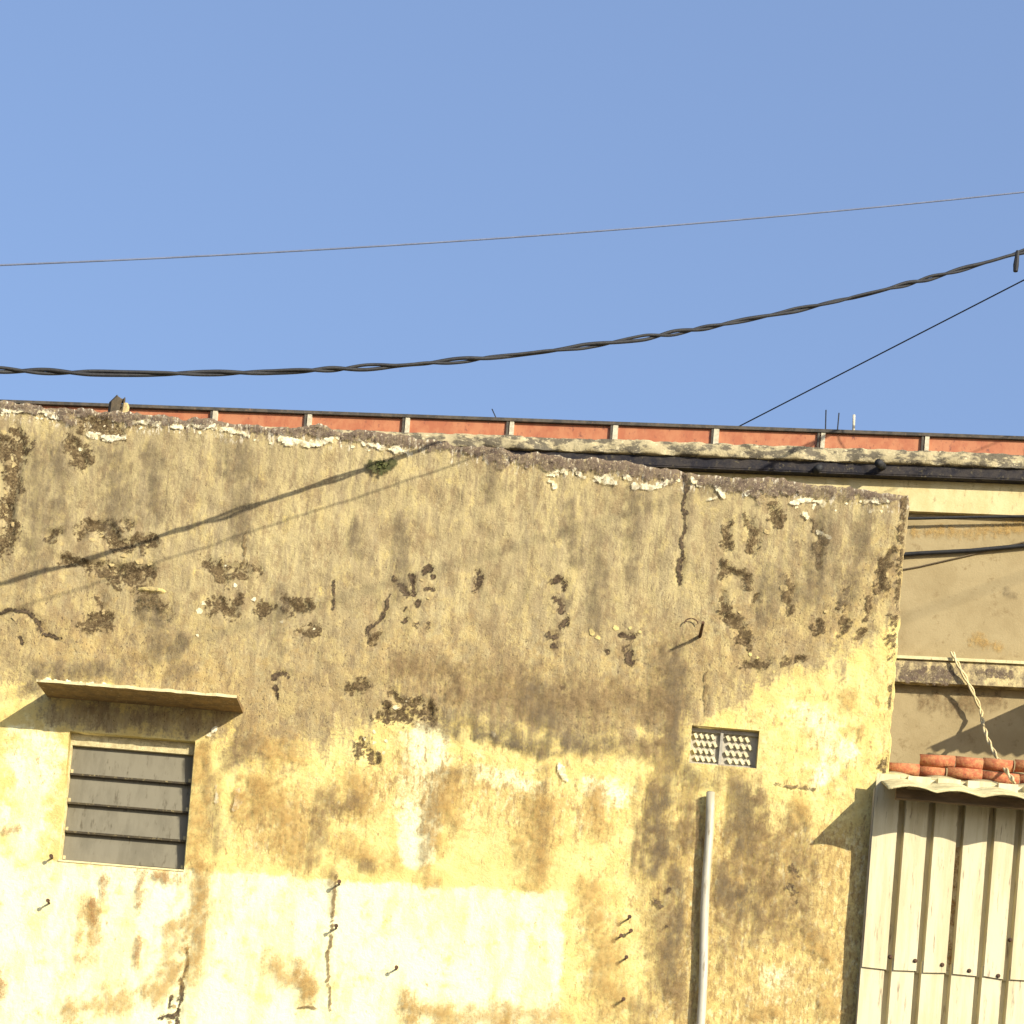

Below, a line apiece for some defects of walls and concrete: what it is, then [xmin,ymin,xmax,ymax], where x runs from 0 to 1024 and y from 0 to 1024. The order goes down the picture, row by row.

spalling [0,427,37,561]
spalling [43,516,161,596]
spalling [196,552,322,638]
spalling [392,564,436,629]
spalling [545,574,570,650]
peeling [547,467,673,490]
crack [676,473,692,586]
spalling [717,496,907,673]
spalling [345,675,371,696]
spalling [353,687,439,770]
leakage [444,636,700,1018]
leakage [715,765,823,943]